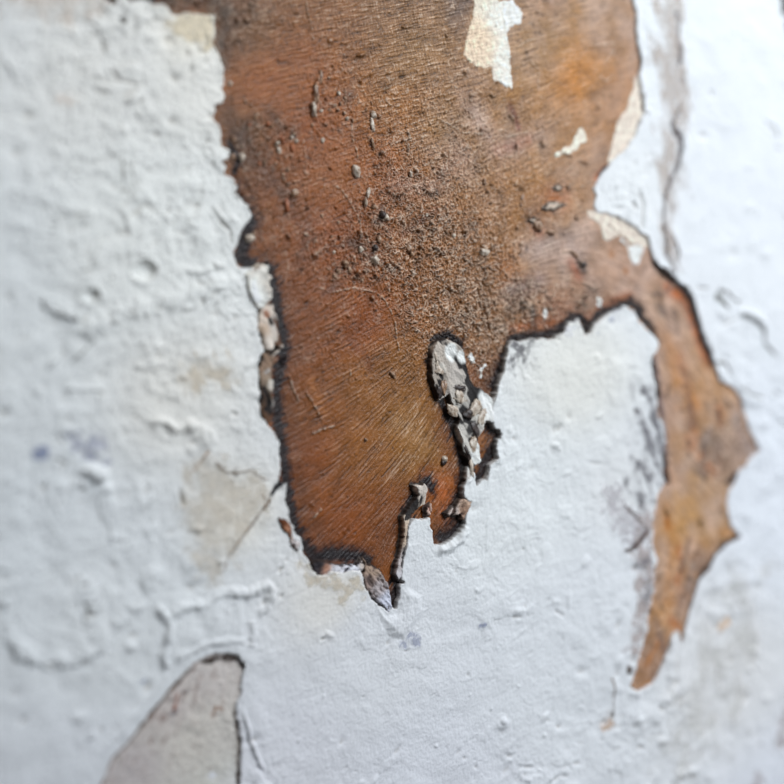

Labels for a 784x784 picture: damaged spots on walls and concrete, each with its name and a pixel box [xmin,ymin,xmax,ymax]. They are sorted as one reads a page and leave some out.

crack [675,10,685,83]
crack [663,105,683,272]
spalling [145,0,758,691]
peeling [101,653,246,784]